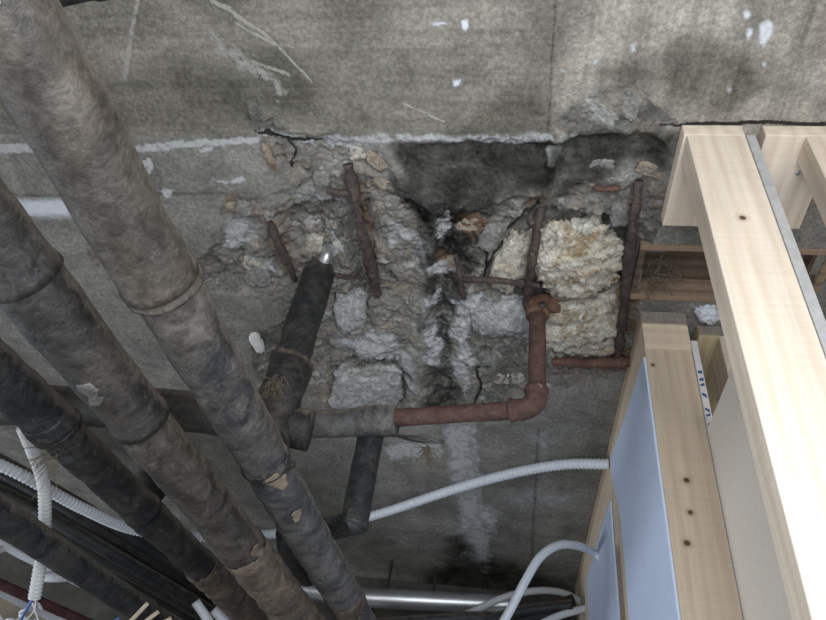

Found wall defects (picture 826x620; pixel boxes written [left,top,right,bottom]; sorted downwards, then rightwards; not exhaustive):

leakage [0,143,33,154]
crack [254,129,323,167]
crack [660,119,826,127]
leakage [135,128,669,407]
spalling [197,96,668,410]
leakage [384,422,558,596]